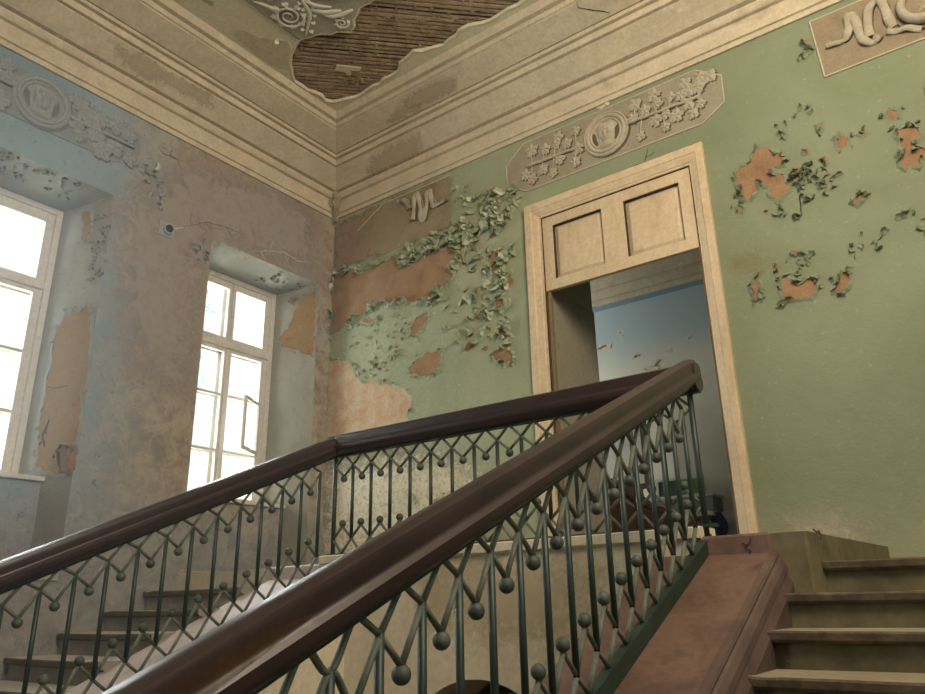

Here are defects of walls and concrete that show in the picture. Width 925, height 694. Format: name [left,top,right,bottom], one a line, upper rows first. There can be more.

peeling [232,0,529,104]
peeling [730,103,871,221]
peeling [878,106,925,173]
peeling [0,152,111,285]
peeling [255,184,522,439]
peeling [747,271,766,305]
peeling [771,226,890,308]
peeling [895,207,925,236]
spalling [32,302,95,479]